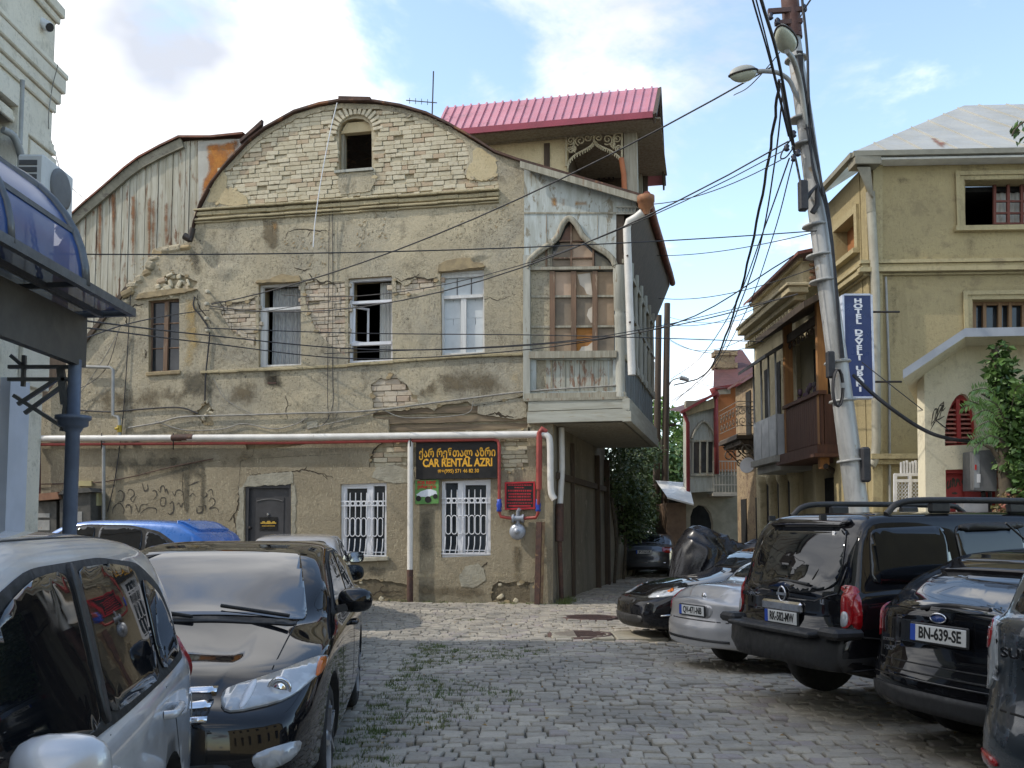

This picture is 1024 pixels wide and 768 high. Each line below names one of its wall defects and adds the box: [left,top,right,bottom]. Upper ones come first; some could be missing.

corrosion [203,142,237,192]
flaking render [207,106,498,206]
corrosion [98,195,115,252]
corrosion [148,199,167,254]
spalling [120,244,197,306]
flaking render [255,230,353,360]
flaking render [369,372,530,473]
crack [229,441,341,532]
flaking render [490,580,535,603]